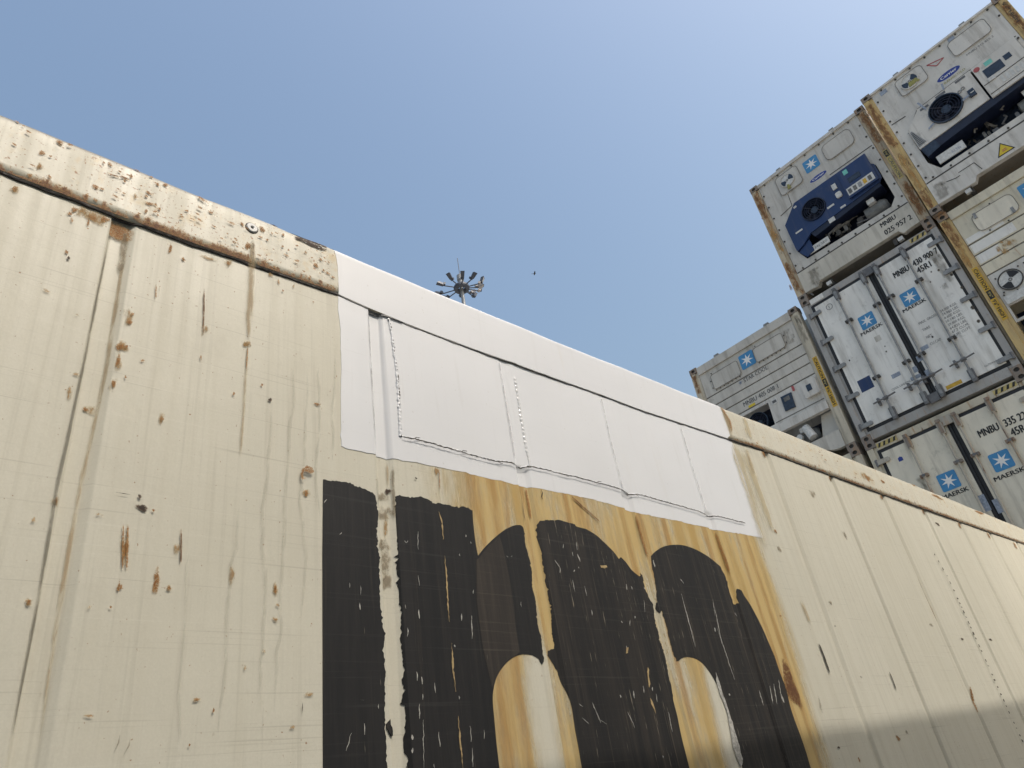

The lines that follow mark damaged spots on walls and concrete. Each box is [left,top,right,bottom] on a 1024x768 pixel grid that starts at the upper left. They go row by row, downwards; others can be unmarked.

corrosion [0,150,336,291]
corrosion [121,526,129,567]
corrosion [722,409,1024,548]
corrosion [459,472,827,768]